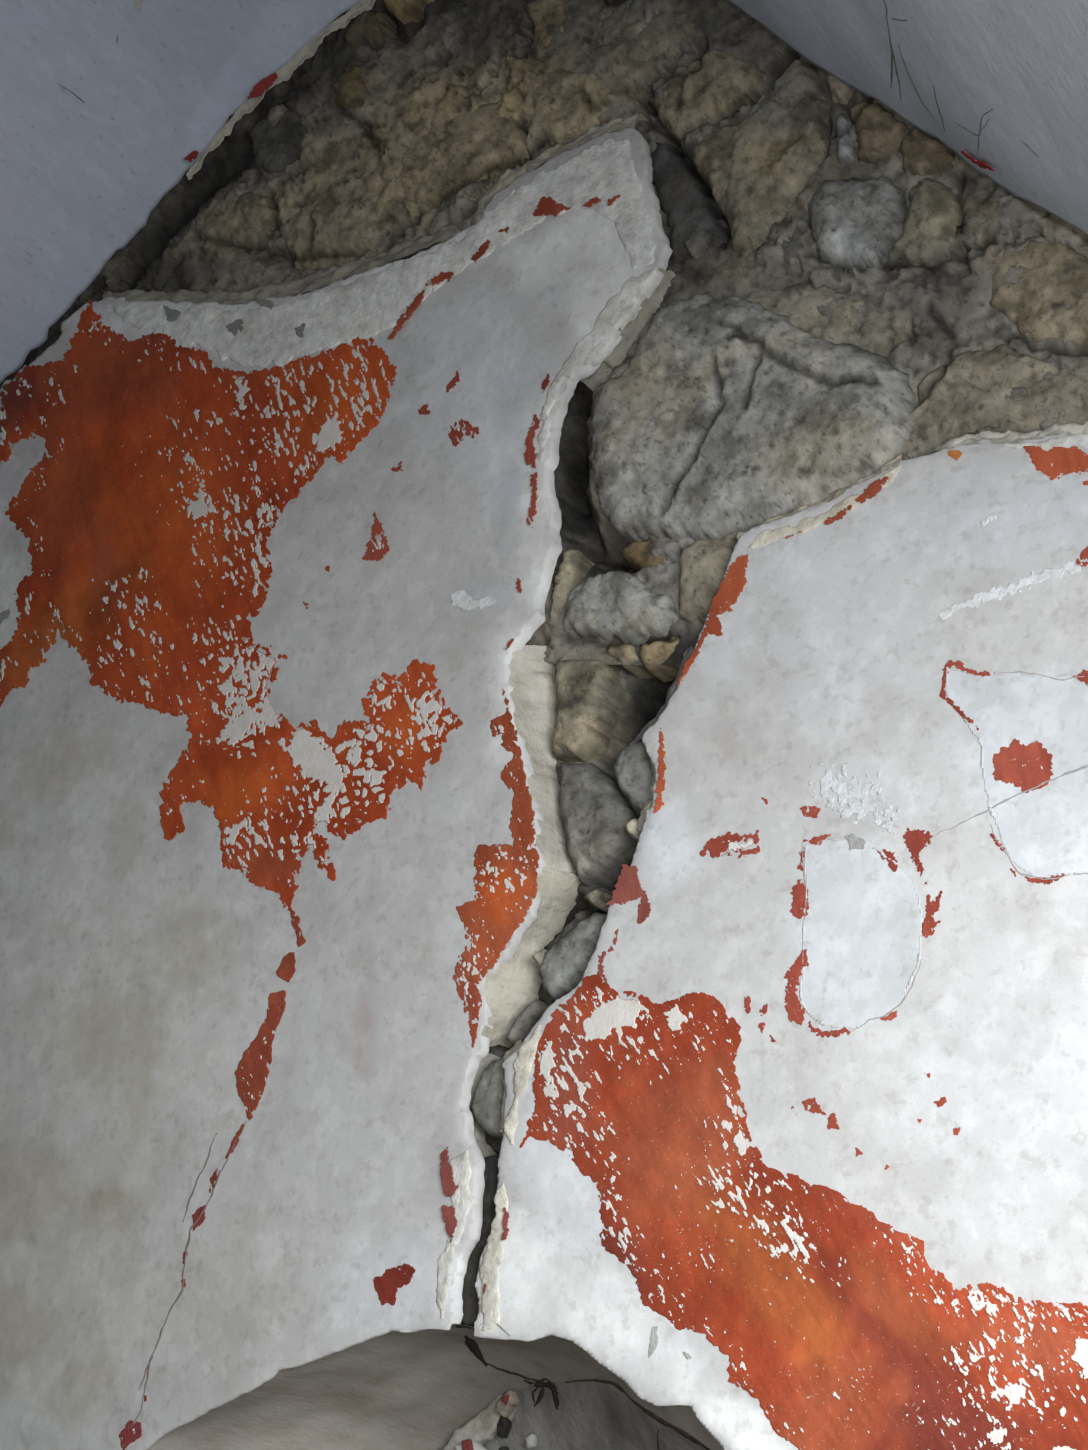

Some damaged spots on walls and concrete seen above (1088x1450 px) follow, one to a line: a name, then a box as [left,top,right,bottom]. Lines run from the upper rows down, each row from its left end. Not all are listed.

crack [883,0,993,155]
spalling [0,0,1088,1159]
crack [436,637,711,1450]
peeling [192,1169,218,1231]
peeling [440,1147,459,1242]
peeling [119,1420,142,1450]